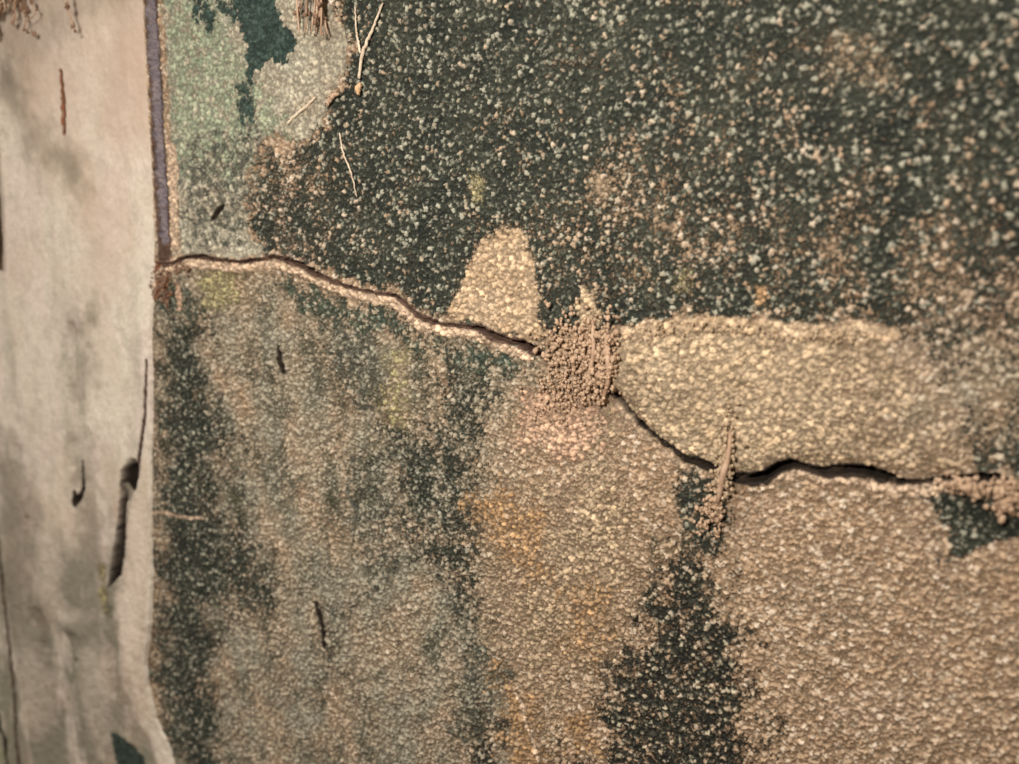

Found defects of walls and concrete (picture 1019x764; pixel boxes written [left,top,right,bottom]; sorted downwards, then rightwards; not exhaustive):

crack [276,344,286,374]
water stain [322,327,389,410]
crack [607,385,1019,510]
water stain [672,464,734,568]
water stain [306,442,413,706]